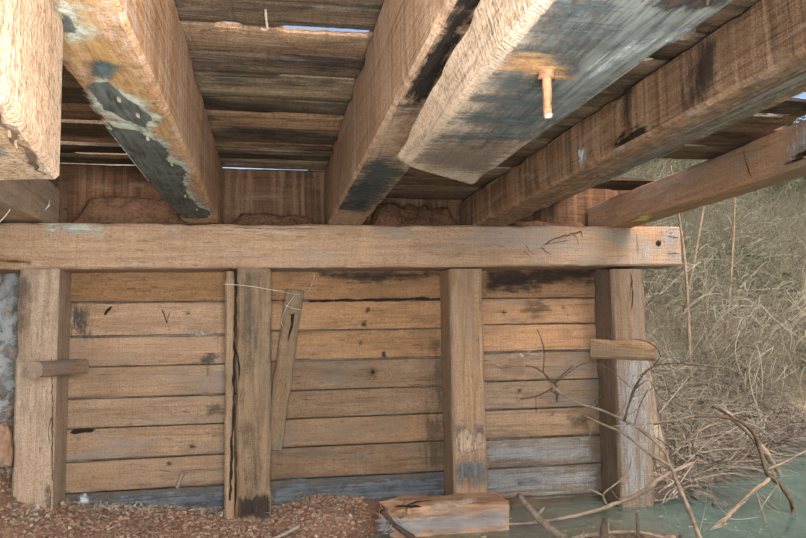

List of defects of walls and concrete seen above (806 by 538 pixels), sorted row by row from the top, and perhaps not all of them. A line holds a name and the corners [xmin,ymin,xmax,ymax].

rust [494,53,566,78]
damp [438,0,733,147]
damp [339,156,405,215]
crack [157,271,240,500]